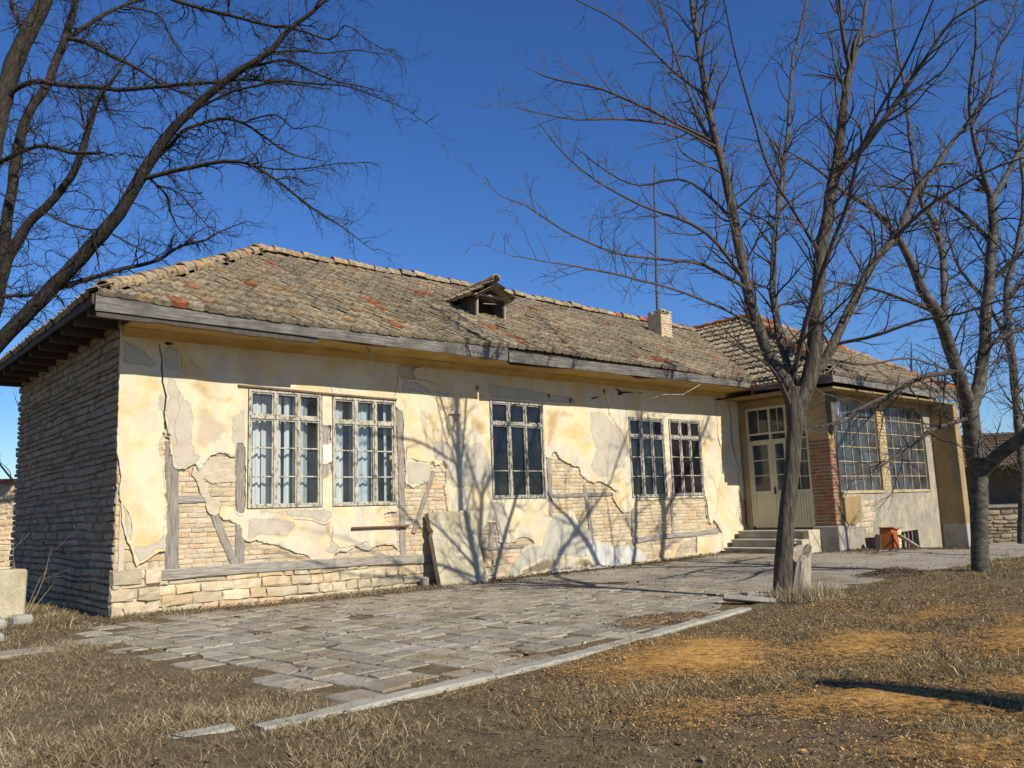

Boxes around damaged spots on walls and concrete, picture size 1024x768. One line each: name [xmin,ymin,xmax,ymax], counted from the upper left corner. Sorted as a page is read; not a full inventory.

crack [158,344,204,444]
flaking render [125,379,331,570]
flaking render [326,408,491,558]
flaking render [546,412,723,561]